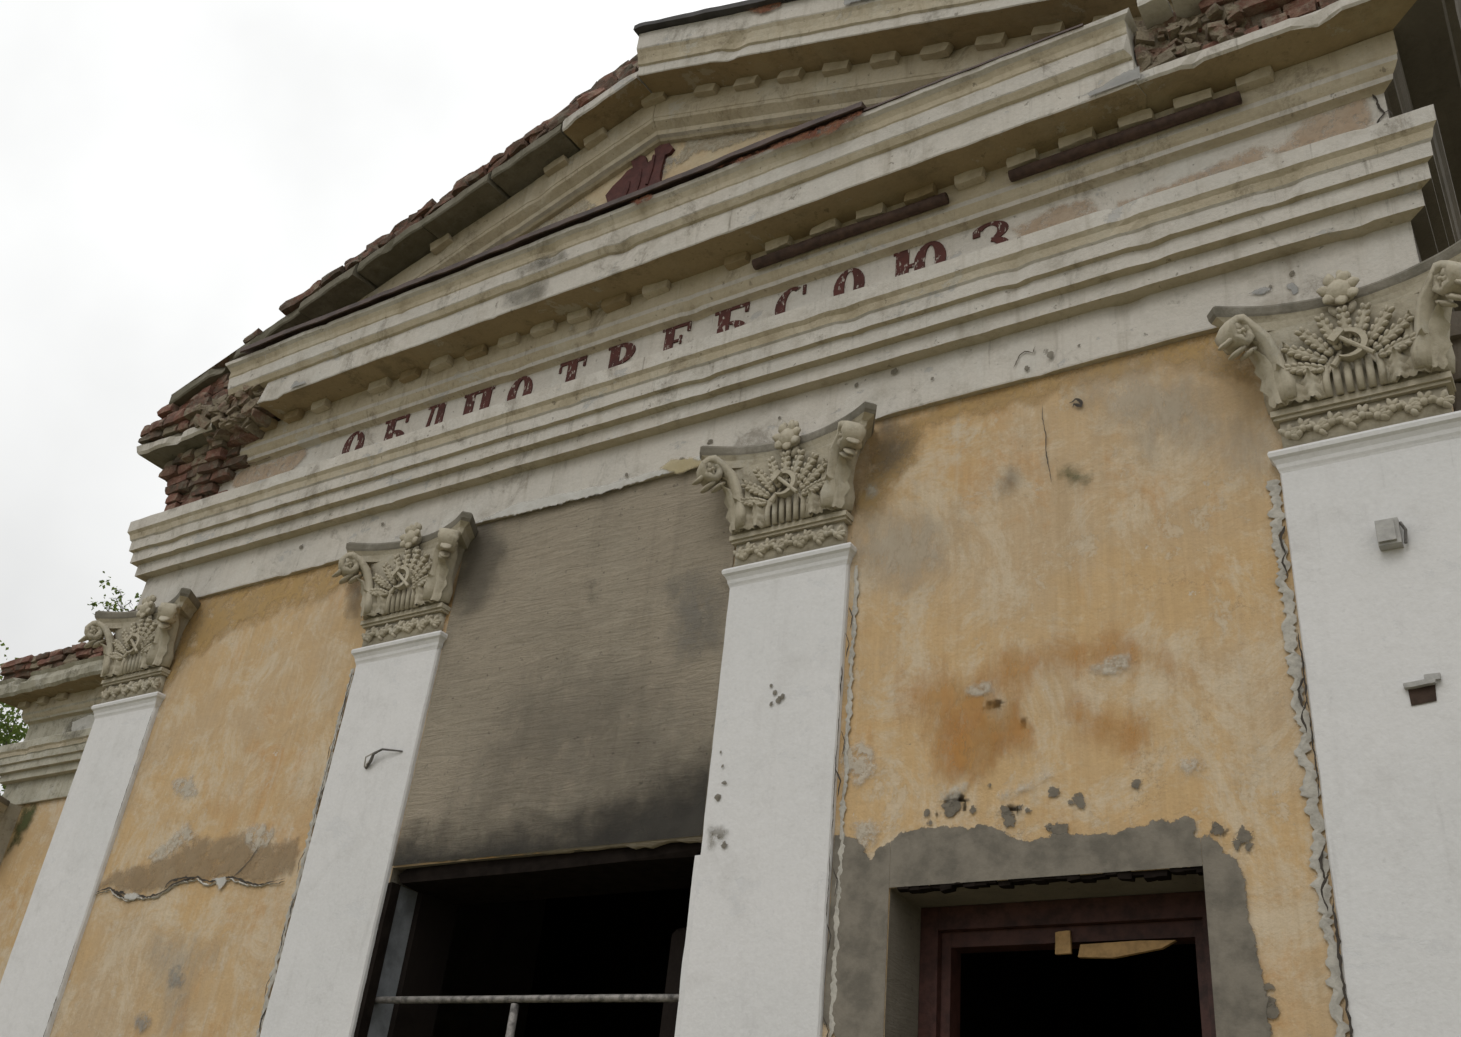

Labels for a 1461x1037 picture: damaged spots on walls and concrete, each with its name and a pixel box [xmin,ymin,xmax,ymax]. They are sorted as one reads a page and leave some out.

spalling [1088,0,1339,96]
spalling [279,54,639,316]
spalling [137,328,306,511]
crack [1042,407,1051,478]
crack [1266,479,1353,1037]
peeling [102,824,299,892]
crack [96,668,355,1037]
flaking render [897,866,1204,894]